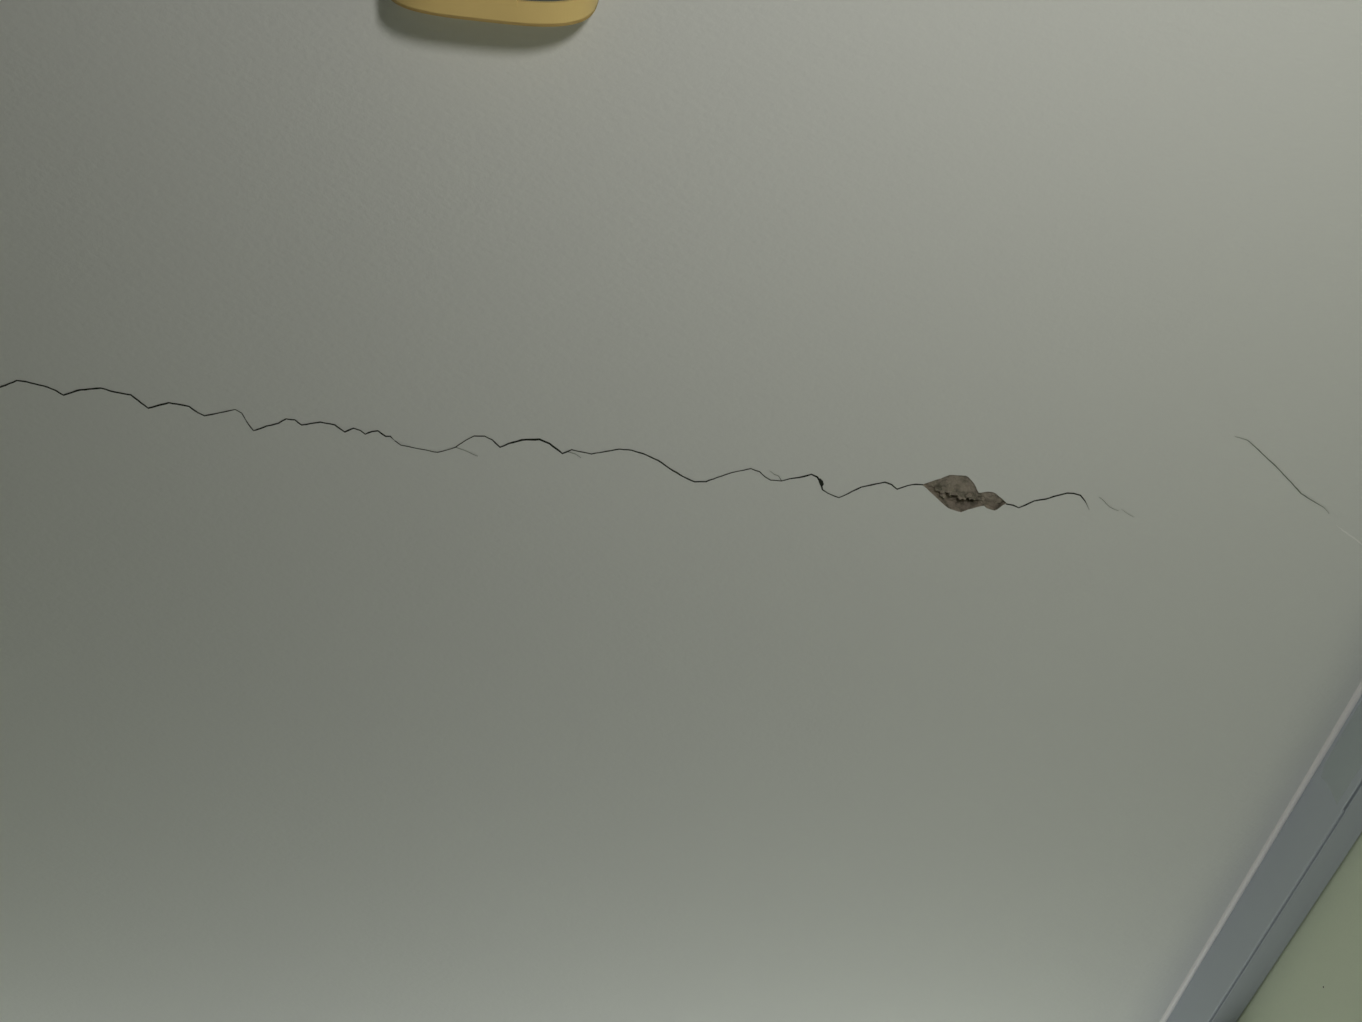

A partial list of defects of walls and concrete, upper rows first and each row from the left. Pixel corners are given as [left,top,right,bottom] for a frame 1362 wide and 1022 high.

crack [0,380,923,498]
flaking render [923,475,1006,512]
crack [1006,492,1133,517]